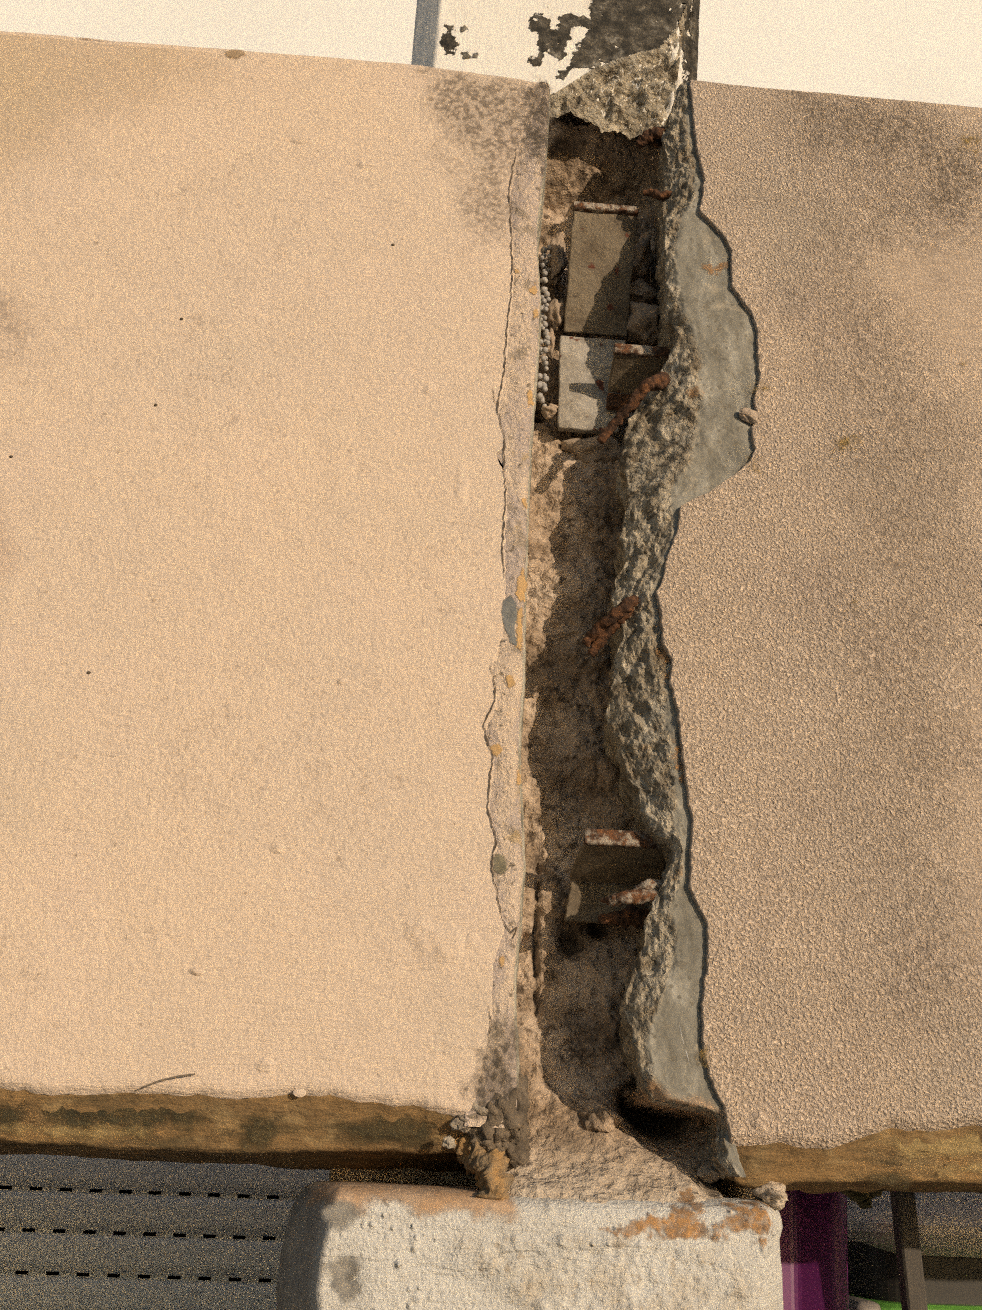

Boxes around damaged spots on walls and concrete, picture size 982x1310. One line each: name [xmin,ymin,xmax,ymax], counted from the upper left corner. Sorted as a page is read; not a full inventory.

spalling [527,0,759,1180]
water stain [45,1127,143,1138]
spalling [442,1065,531,1201]
water stain [896,1134,982,1174]
rust [607,1189,771,1245]